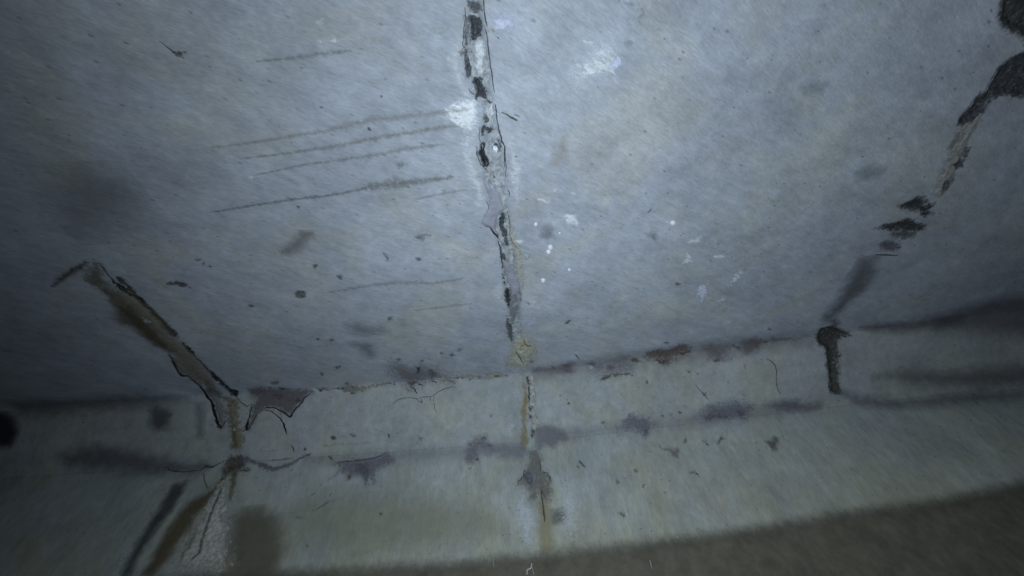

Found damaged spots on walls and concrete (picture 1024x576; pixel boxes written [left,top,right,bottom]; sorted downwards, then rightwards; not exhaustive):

spalling [998,0,1024,37]
spalling [957,53,1024,127]
crack [462,0,544,272]
spalling [942,147,970,194]
crack [168,354,295,451]
peeling [245,359,504,431]